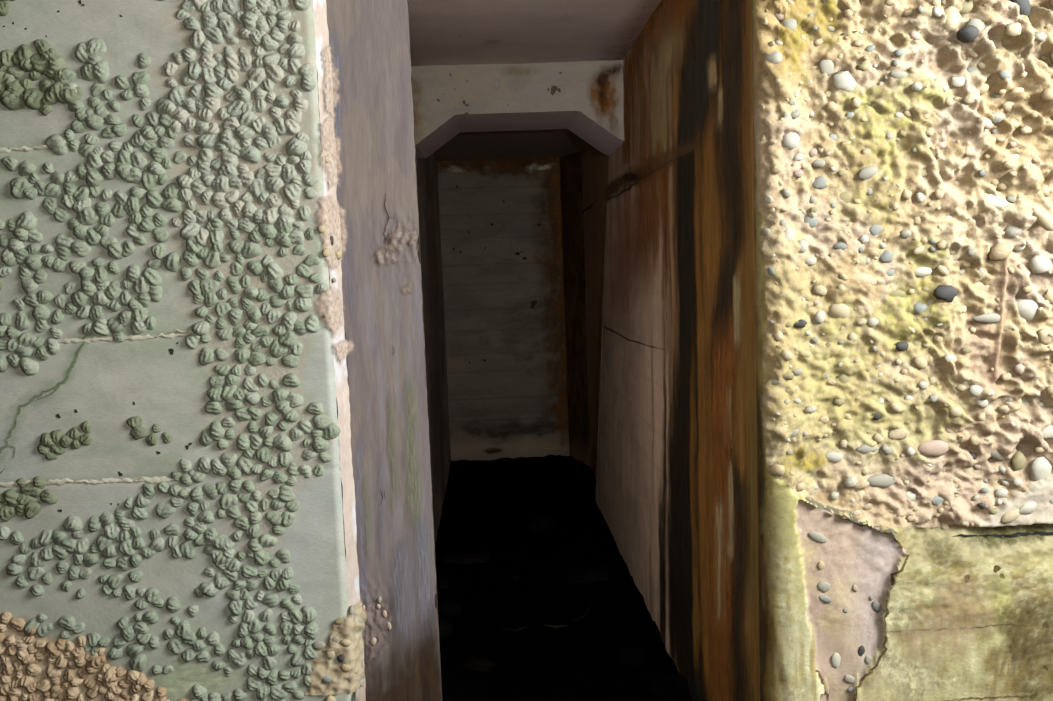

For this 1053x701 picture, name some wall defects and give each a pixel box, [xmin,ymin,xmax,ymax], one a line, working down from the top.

corrosion [591,0,690,279]
crack [0,322,94,473]
spalling [752,0,1053,701]
crack [956,530,1053,538]
water stain [876,592,960,699]
water stain [999,599,1053,701]